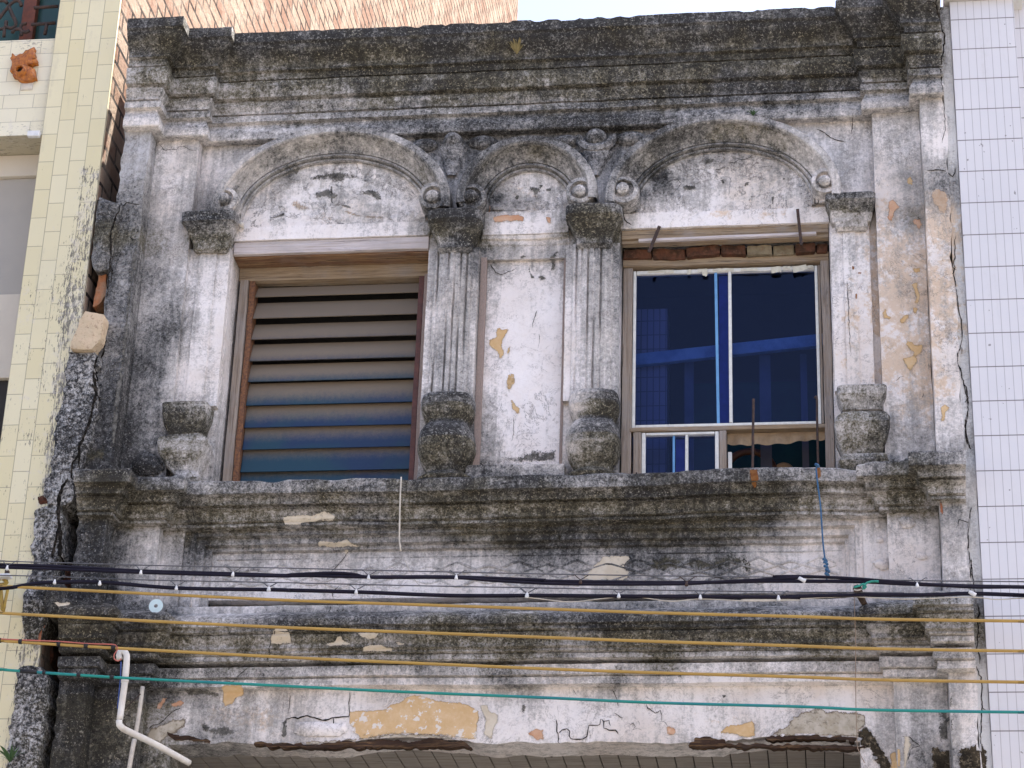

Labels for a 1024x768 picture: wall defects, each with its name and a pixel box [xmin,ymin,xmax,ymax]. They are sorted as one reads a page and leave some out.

water stain [82,239,138,464]
peeling [489,328,510,358]
crack [952,238,971,450]
peeling [507,374,520,413]
crack [51,340,107,565]
peeling [283,511,335,525]
peeling [584,555,630,580]
water stain [651,553,751,574]
crack [285,693,350,723]
peeling [254,695,498,752]
crack [556,691,668,744]
spalling [688,709,911,768]